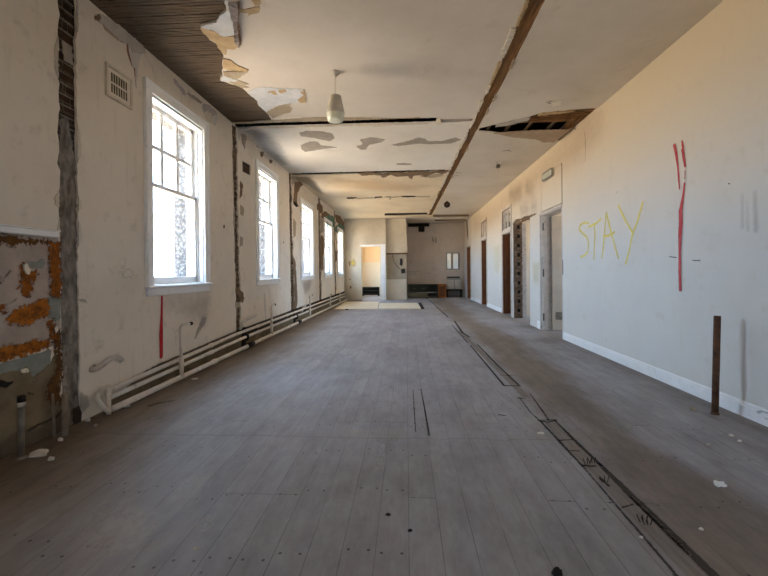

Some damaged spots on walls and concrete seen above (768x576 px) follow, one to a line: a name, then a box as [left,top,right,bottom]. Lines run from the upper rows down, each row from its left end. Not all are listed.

peeling [0,0,82,459]
flaking render [89,0,596,406]